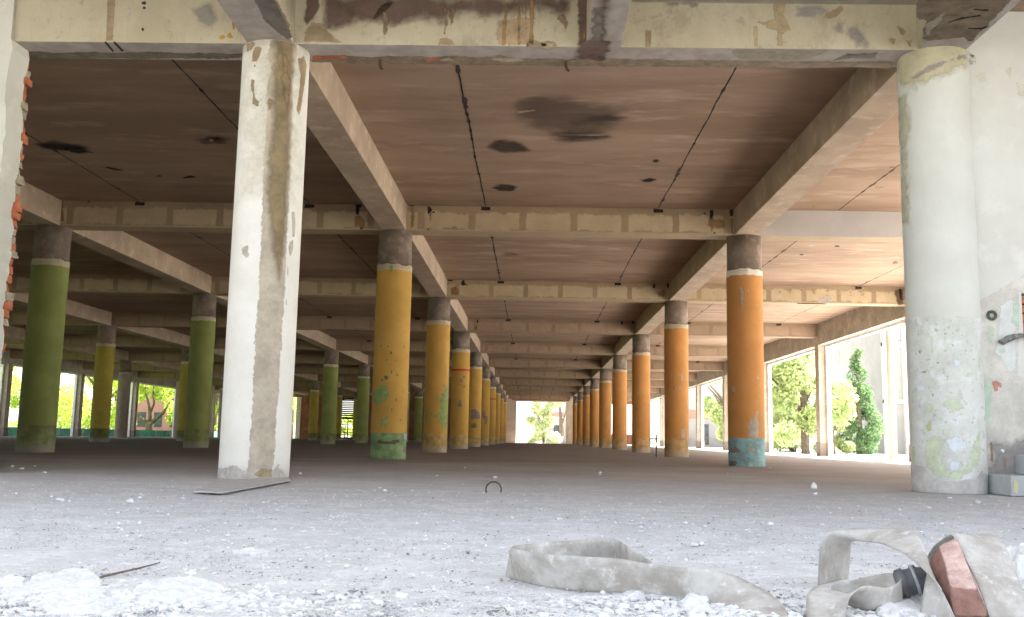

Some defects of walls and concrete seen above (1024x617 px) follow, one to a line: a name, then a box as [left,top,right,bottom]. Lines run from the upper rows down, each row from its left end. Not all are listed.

water stain [304,0,611,61]
flaking render [889,0,1011,83]
water stain [38,142,92,153]
crack [455,65,491,211]
water stain [490,140,529,153]
water stain [518,99,614,141]
crack [653,67,737,213]
peeling [29,0,903,479]
peeling [908,276,1024,494]